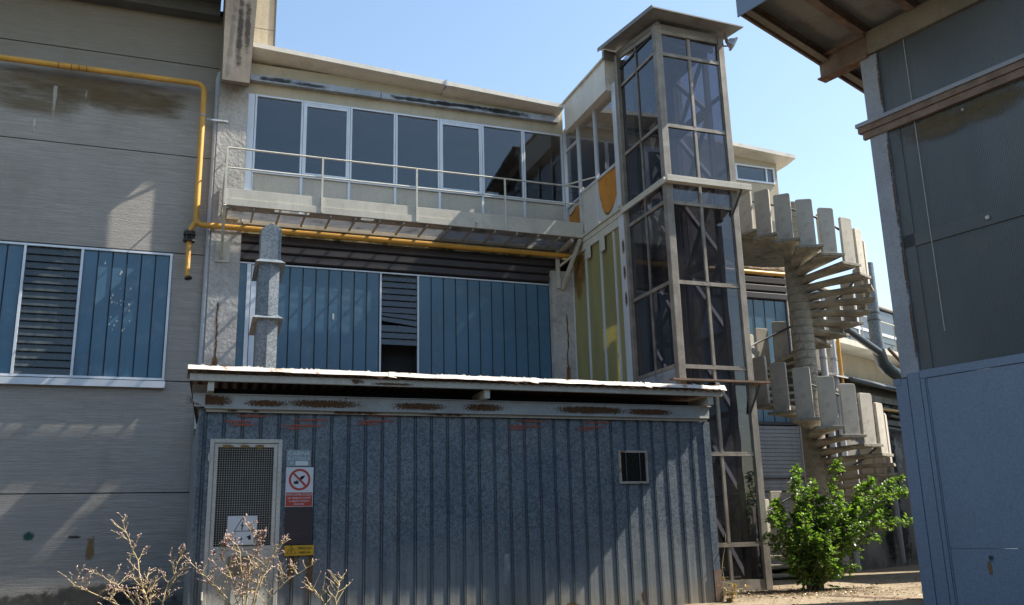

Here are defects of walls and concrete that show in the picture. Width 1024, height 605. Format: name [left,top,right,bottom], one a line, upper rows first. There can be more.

water stain [236,0,251,65]
water stain [2,68,172,127]
corrosion [188,395,380,415]
corrosion [392,403,504,416]
corrosion [555,406,673,415]